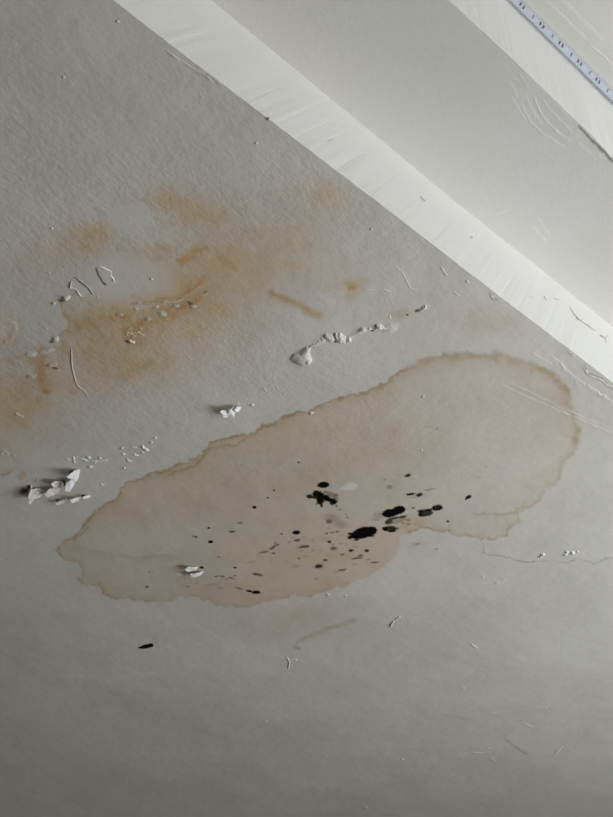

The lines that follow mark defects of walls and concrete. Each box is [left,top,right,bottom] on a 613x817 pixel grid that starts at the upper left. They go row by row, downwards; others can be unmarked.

peeling [220,386,285,418]
peeling [21,469,90,505]
mould [307,482,337,507]
mould [348,505,443,552]